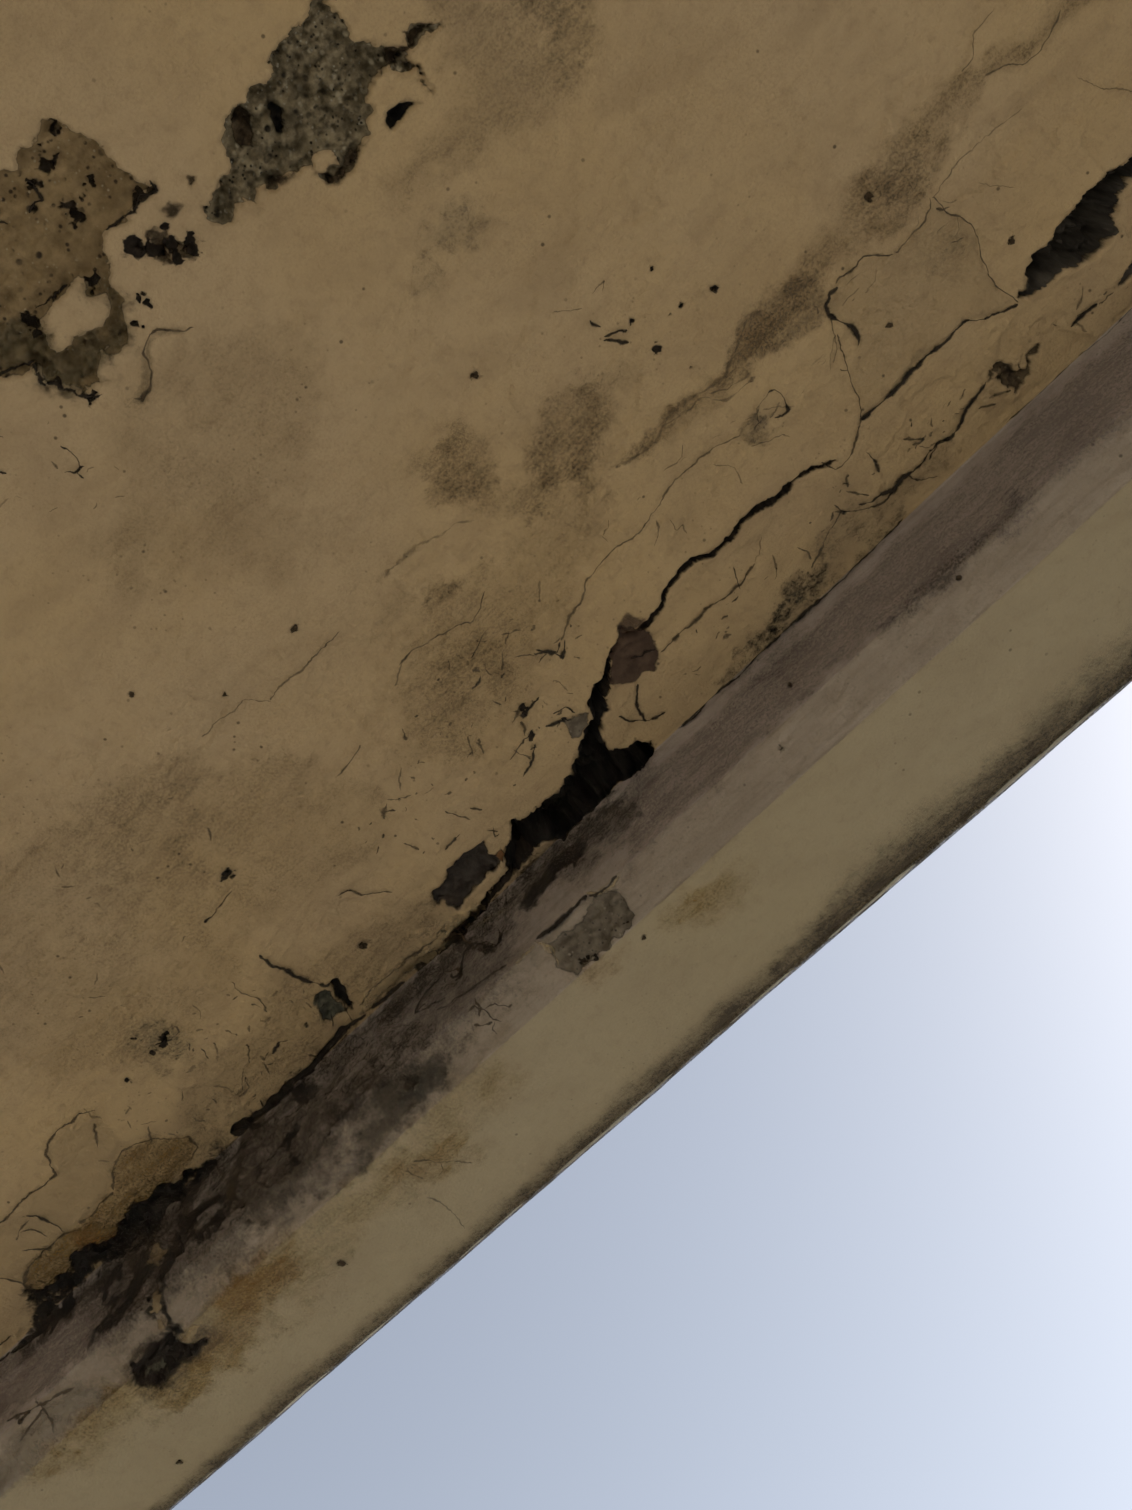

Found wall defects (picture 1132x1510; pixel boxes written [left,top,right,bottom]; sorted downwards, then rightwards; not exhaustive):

flaking render [204,0,440,224]
flaking render [0,118,202,405]
spalling [1018,157,1132,296]
flaking render [1071,263,1132,327]
crack [51,446,122,509]
crack [358,197,1131,854]
spalling [359,614,665,1014]
leakage [0,331,1132,1510]
crack [0,828,534,1286]
crack [0,1300,76,1361]
crack [7,1387,74,1441]
spalling [130,1325,220,1389]